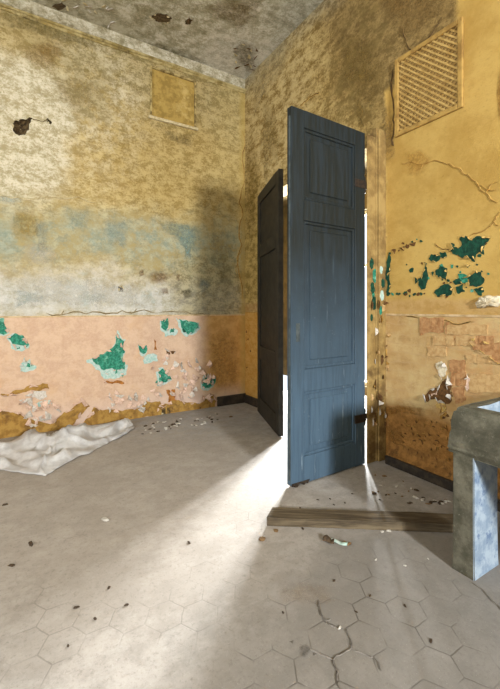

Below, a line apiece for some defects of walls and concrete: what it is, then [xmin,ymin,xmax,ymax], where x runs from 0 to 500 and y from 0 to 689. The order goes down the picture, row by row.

peeling [52,0,113,14]
peeling [150,13,172,24]
hole [12,116,52,136]
crack [402,160,500,236]
peeling [0,318,37,372]
crack [47,308,217,316]
peeling [160,318,200,337]
peeling [369,236,490,427]
peeling [0,330,217,439]
flaking render [400,317,500,462]
crack [310,601,381,689]